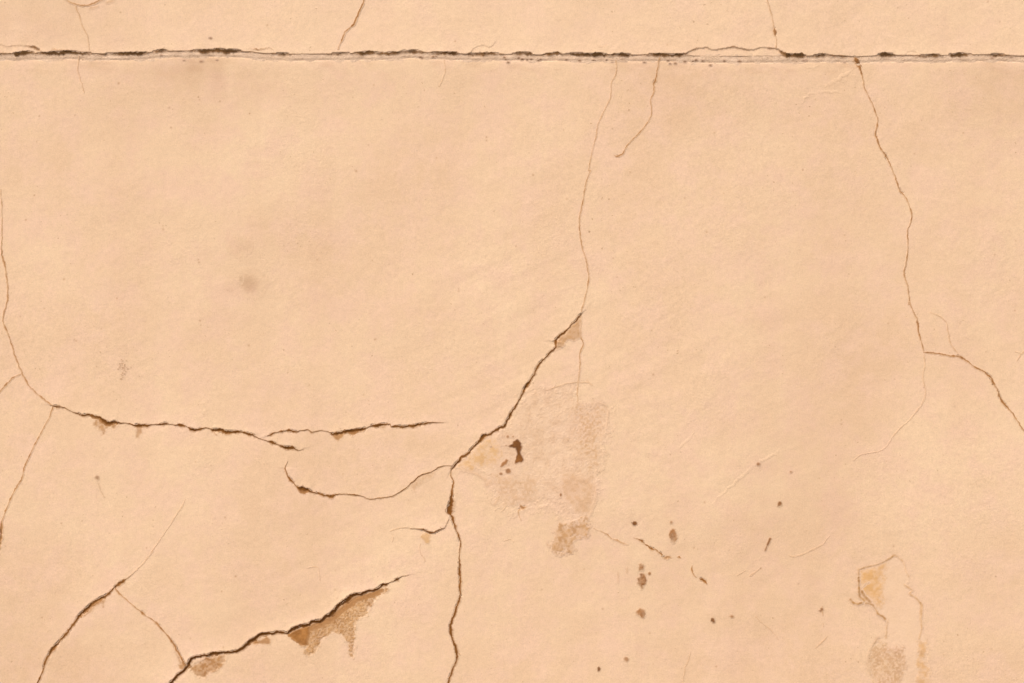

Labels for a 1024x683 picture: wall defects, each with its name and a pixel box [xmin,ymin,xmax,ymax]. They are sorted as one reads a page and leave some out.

crack [0,0,742,683]
peeling [449,373,617,557]
peeling [848,553,933,683]
crack [766,0,1024,461]